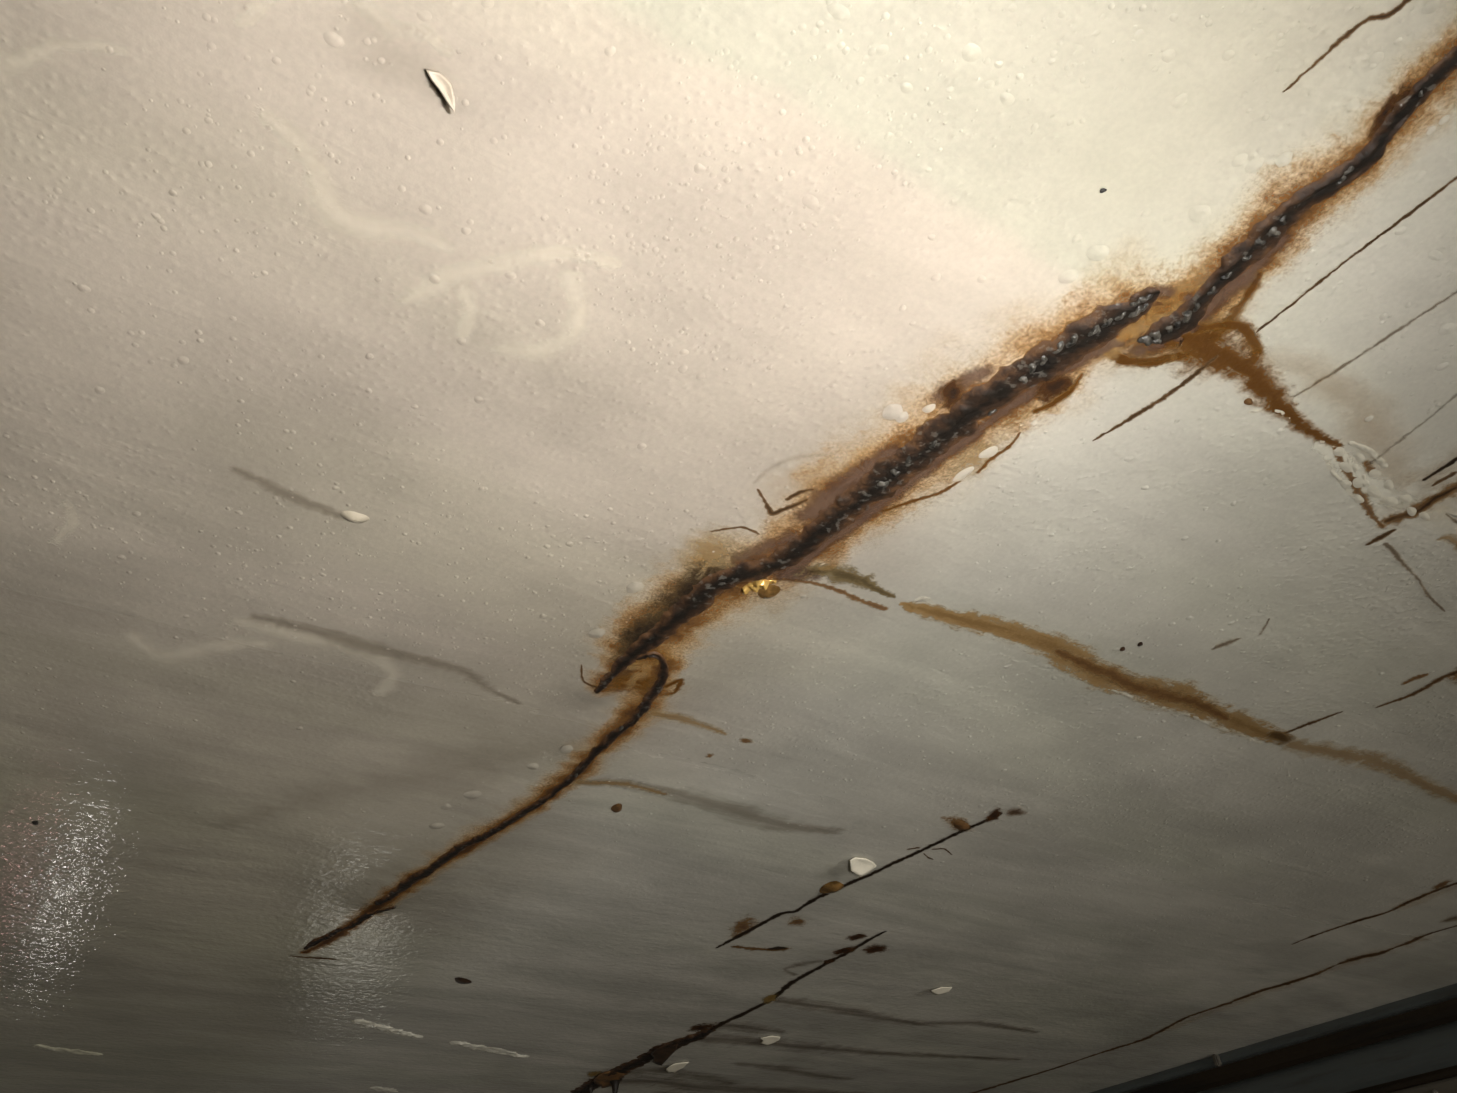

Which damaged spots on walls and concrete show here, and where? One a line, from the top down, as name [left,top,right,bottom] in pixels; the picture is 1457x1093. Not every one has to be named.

crack [1283,0,1411,92]
crack [290,37,1457,960]
peeling [1314,441,1457,529]
crack [570,808,1022,1093]
crack [871,881,1457,1093]